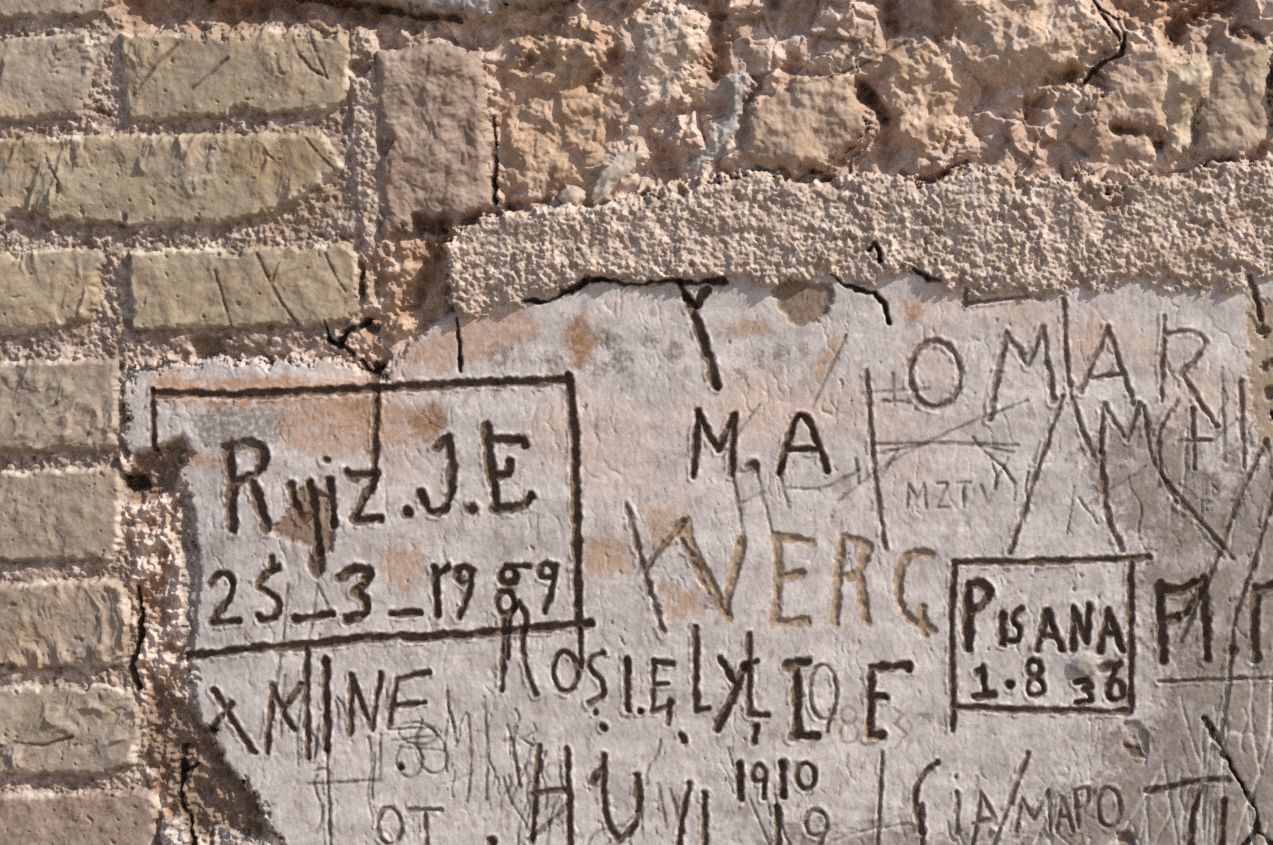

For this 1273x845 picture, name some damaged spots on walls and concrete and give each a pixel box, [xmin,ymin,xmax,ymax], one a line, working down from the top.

crack [1078,0,1126,88]
spalling [592,281,627,298]
crack [523,275,728,304]
spalling [123,363,202,654]
spalling [146,685,268,845]